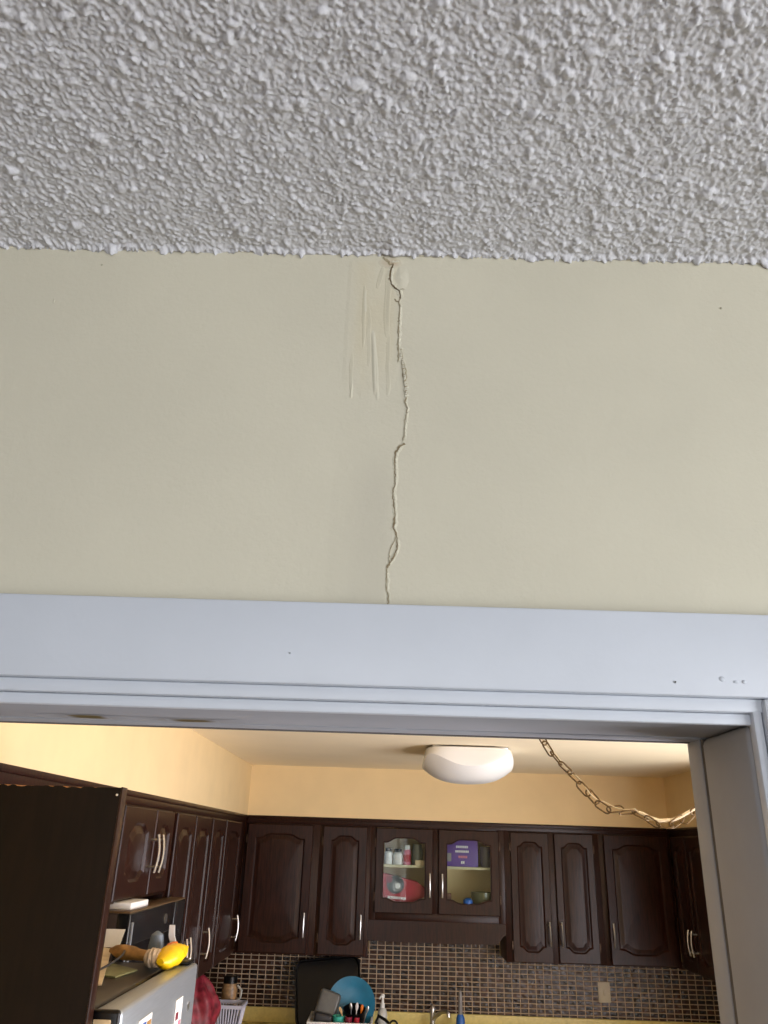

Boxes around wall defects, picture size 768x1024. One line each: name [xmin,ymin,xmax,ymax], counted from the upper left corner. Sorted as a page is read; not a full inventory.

crack [383,257,410,604]